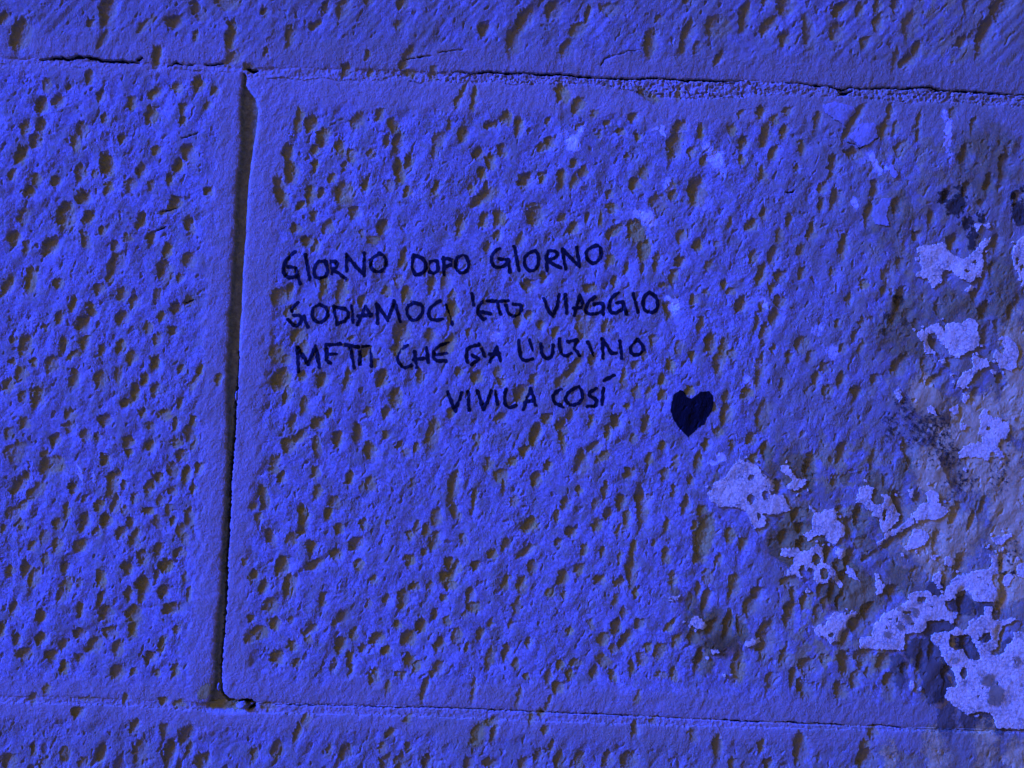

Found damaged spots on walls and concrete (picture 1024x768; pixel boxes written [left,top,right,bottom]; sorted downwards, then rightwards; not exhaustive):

damp [936,109,1024,250]
peeling [915,223,991,292]
peeling [1011,236,1024,287]
peeling [913,318,1019,472]
peeling [694,456,809,557]
peeling [780,506,860,593]
peeling [682,616,707,632]
peeling [813,608,857,644]
peeling [856,479,1024,730]